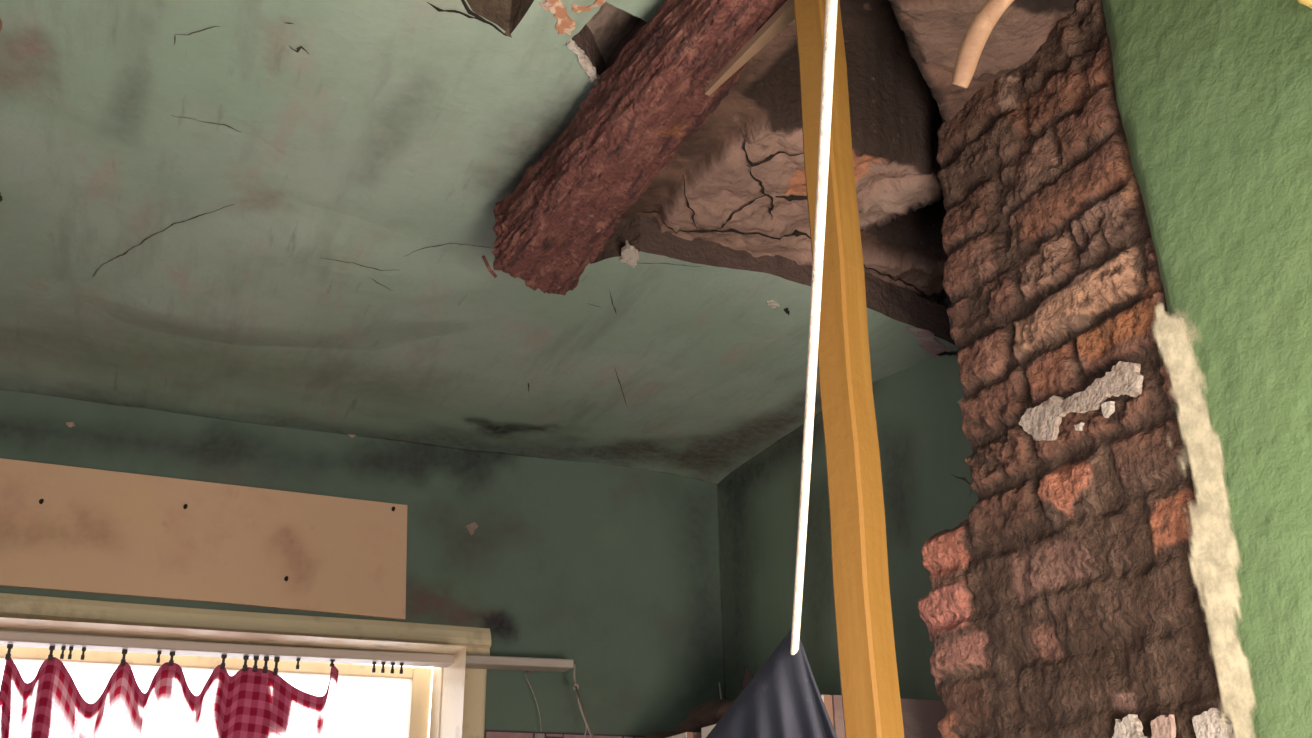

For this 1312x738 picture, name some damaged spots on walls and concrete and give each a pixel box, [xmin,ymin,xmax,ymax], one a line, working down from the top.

spalling [540,0,639,86]
crack [94,204,234,276]
flaking render [906,0,1255,738]